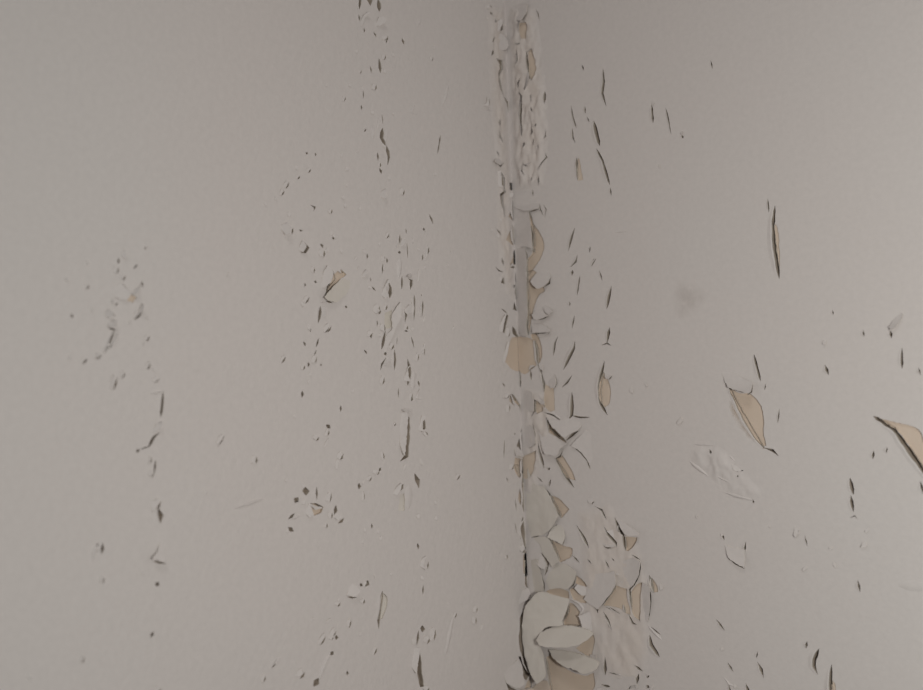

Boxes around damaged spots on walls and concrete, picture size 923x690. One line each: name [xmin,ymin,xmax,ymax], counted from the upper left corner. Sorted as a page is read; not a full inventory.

peeling [356,0,388,43]
peeling [358,53,394,179]
peeling [95,250,148,358]
peeling [296,229,350,397]
peeling [354,225,430,401]
peeling [721,372,779,456]
peeling [873,416,923,479]
peeling [285,483,344,533]